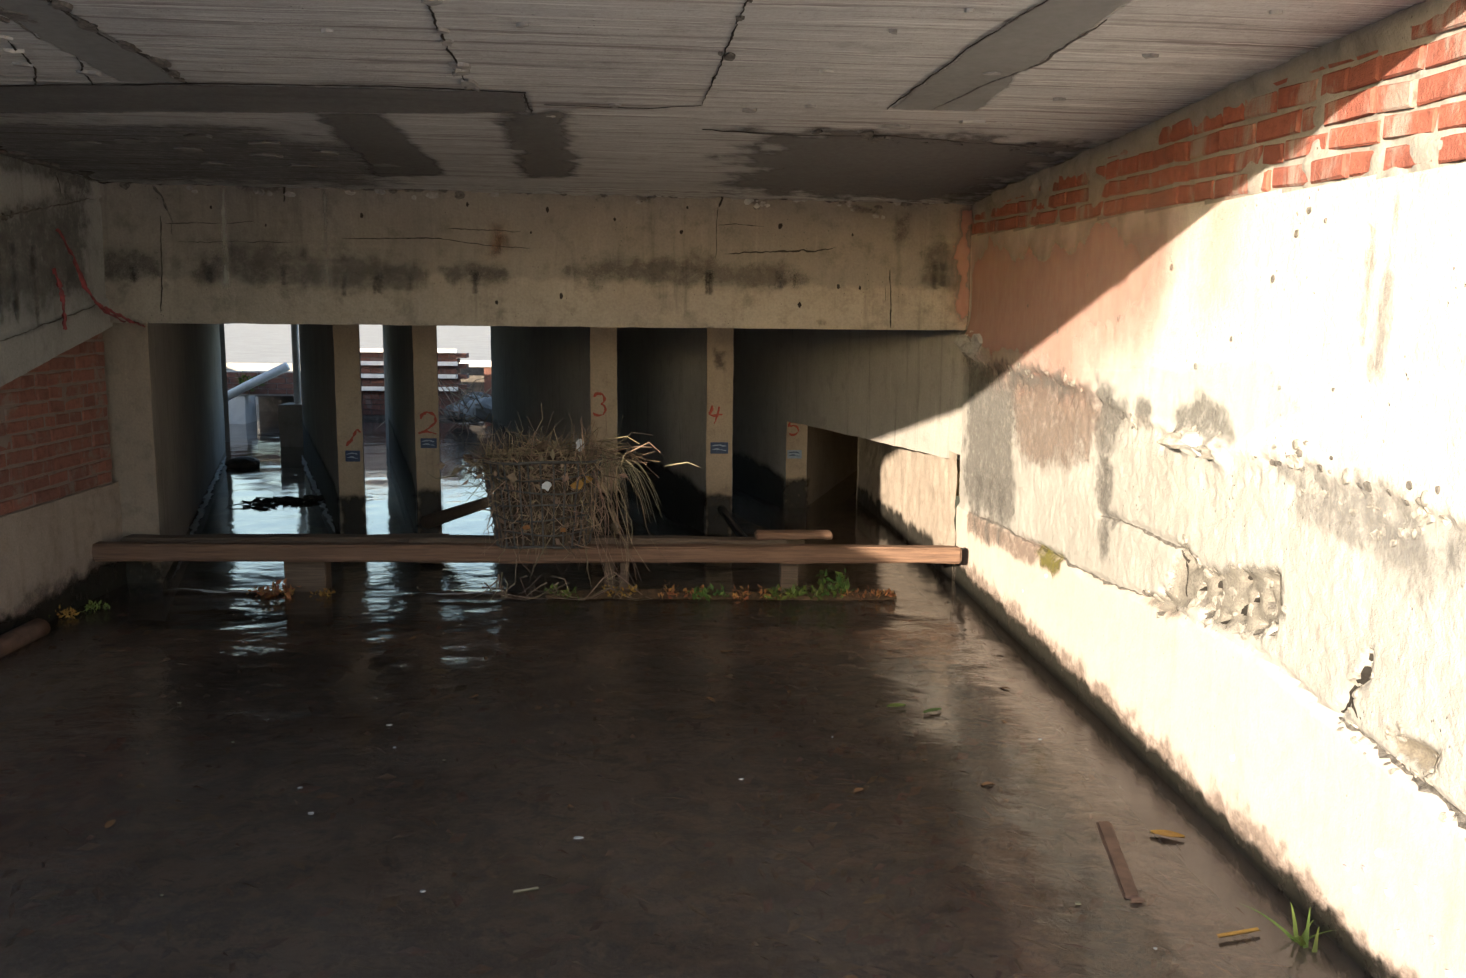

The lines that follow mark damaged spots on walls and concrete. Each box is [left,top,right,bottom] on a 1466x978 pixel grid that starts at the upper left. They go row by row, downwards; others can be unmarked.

crack [421,0,480,92]
crack [544,0,753,109]
spalling [933,20,1107,110]
water stain [0,82,580,178]
water stain [702,128,1086,202]
water stain [964,360,1015,543]
water stain [1096,386,1151,554]
water stain [1175,394,1233,447]
spalling [958,358,1466,815]
crack [1337,647,1466,842]